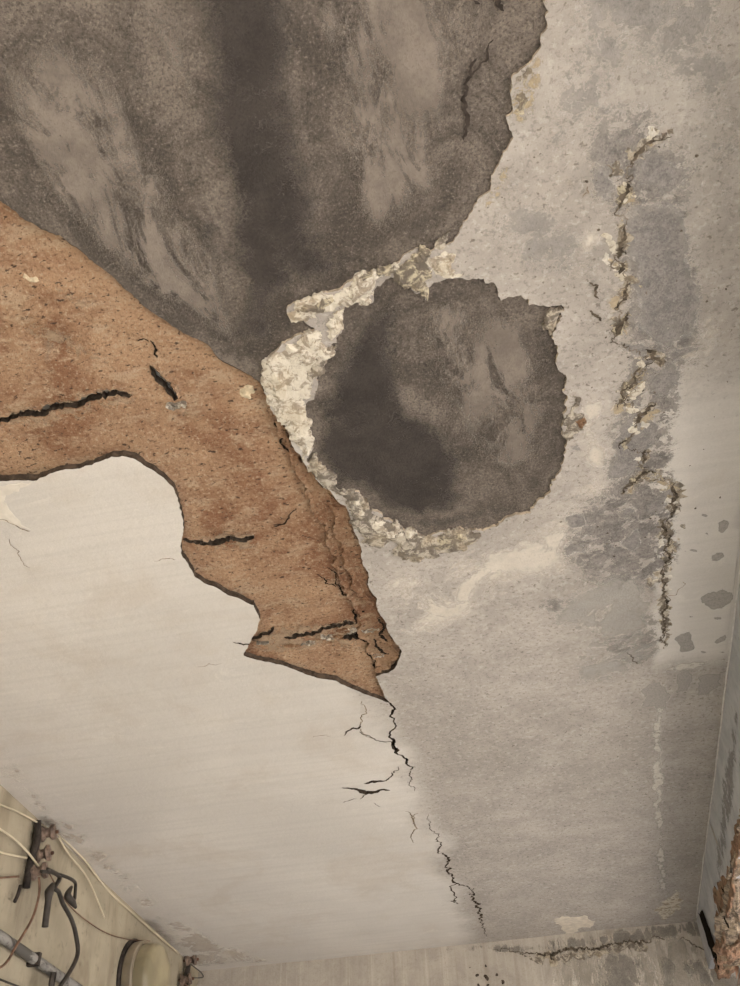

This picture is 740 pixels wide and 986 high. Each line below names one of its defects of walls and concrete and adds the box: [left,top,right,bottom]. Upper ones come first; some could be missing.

water stain [3,0,334,338]
water stain [322,0,453,222]
crack [460,40,493,140]
peeling [0,0,587,703]
water stain [319,313,480,525]
water stain [392,0,733,681]
crack [560,126,704,649]
crack [313,702,732,969]
water stain [714,732,736,875]
spalling [713,809,740,980]